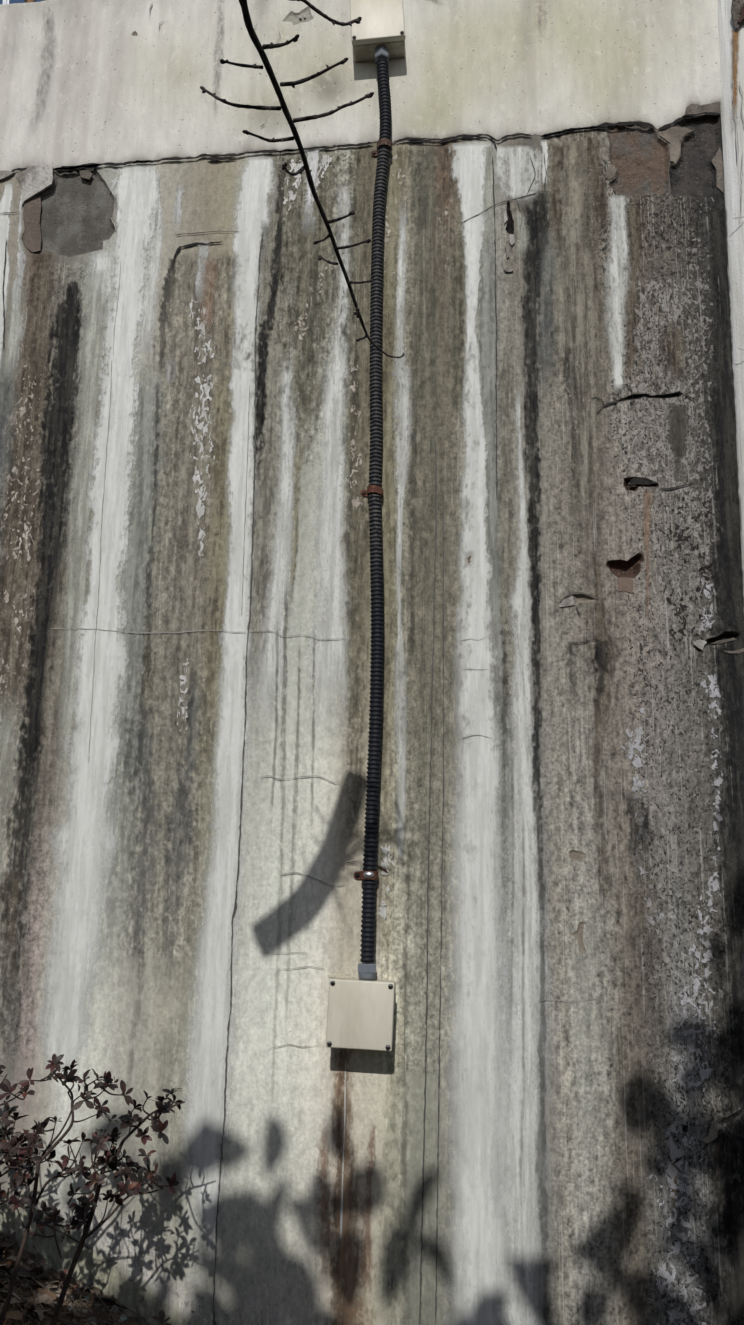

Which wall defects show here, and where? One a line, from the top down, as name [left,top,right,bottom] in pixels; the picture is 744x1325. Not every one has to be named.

spalling [0,165,118,257]
crack [11,81,744,496]
spalling [605,102,723,199]
crack [51,231,349,1325]
damp [0,139,641,1325]
peeling [559,592,598,607]
damp [626,801,649,843]
peeling [606,400,744,654]
damp [669,405,687,462]
damp [697,210,744,1325]
peeling [645,672,726,1325]
rust [319,1051,374,1325]